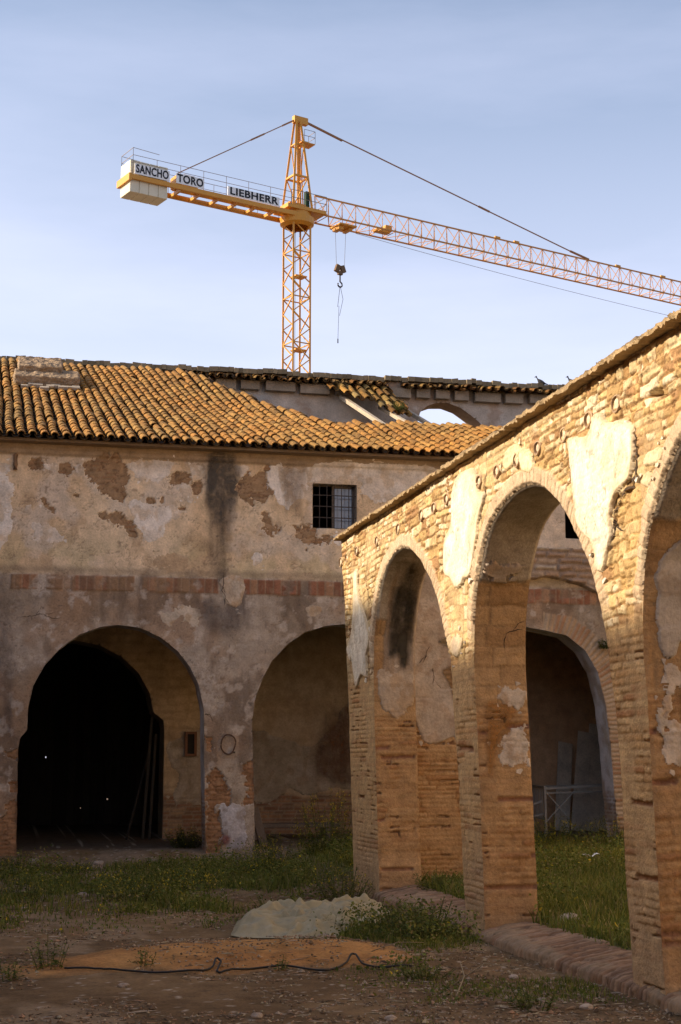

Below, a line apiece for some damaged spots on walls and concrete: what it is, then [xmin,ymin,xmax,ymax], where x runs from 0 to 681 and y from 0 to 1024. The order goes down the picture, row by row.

peeling [0,458,67,550]
flaking render [27,453,205,577]
water stain [206,453,239,534]
peeling [234,459,438,551]
water stain [389,564,417,667]
peeling [654,540,681,776]
peeling [166,701,351,853]
peeling [487,682,531,774]